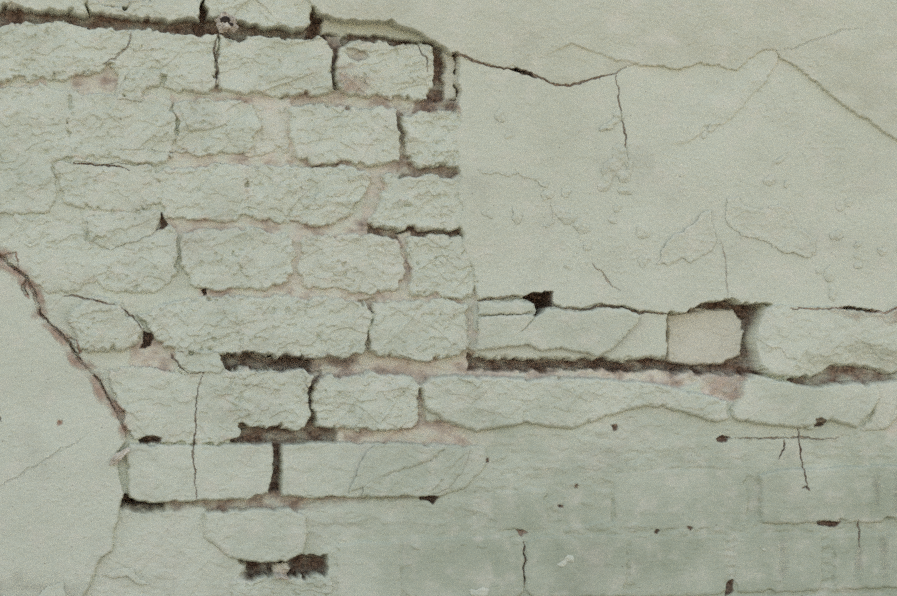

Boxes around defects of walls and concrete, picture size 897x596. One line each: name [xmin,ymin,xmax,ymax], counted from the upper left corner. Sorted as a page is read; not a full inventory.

crack [451,52,627,147]
peeling [86,209,161,250]
crack [69,294,143,330]
flaking render [476,299,641,357]
peeling [173,350,226,373]
crack [0,438,82,487]
peeling [362,445,470,498]
crack [729,429,839,491]